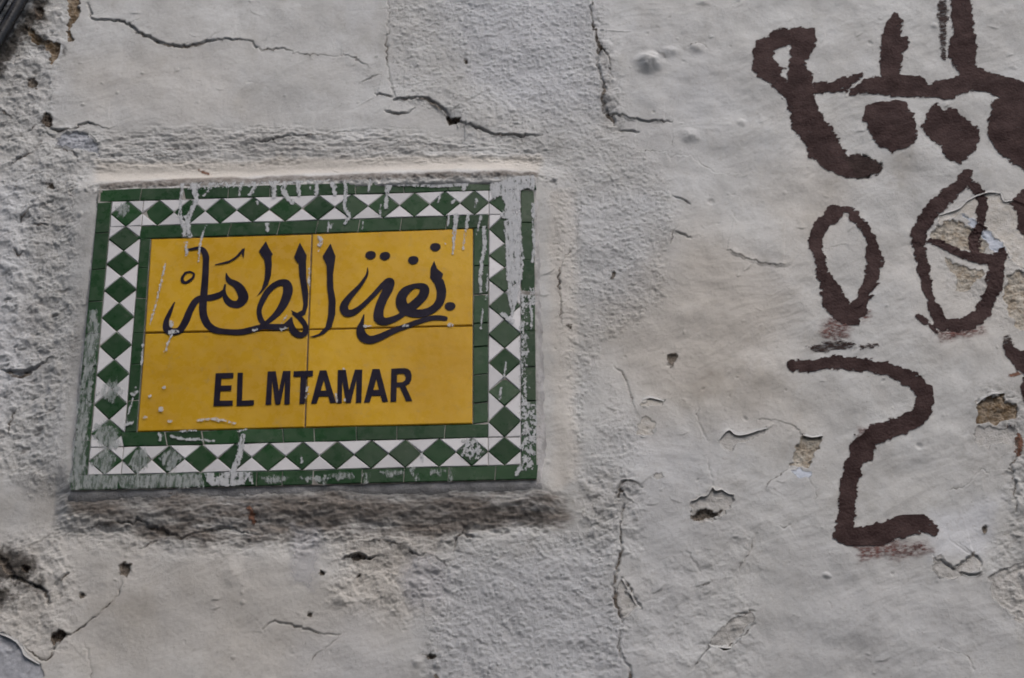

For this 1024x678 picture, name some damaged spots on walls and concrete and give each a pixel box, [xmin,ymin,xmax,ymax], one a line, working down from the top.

spalling [25,0,81,65]
crack [100,20,205,49]
crack [354,44,446,113]
crack [592,22,664,132]
peeling [930,190,1024,330]
spalling [973,392,1018,449]
peeling [789,434,823,478]
spalling [690,485,735,523]
crack [613,483,637,678]